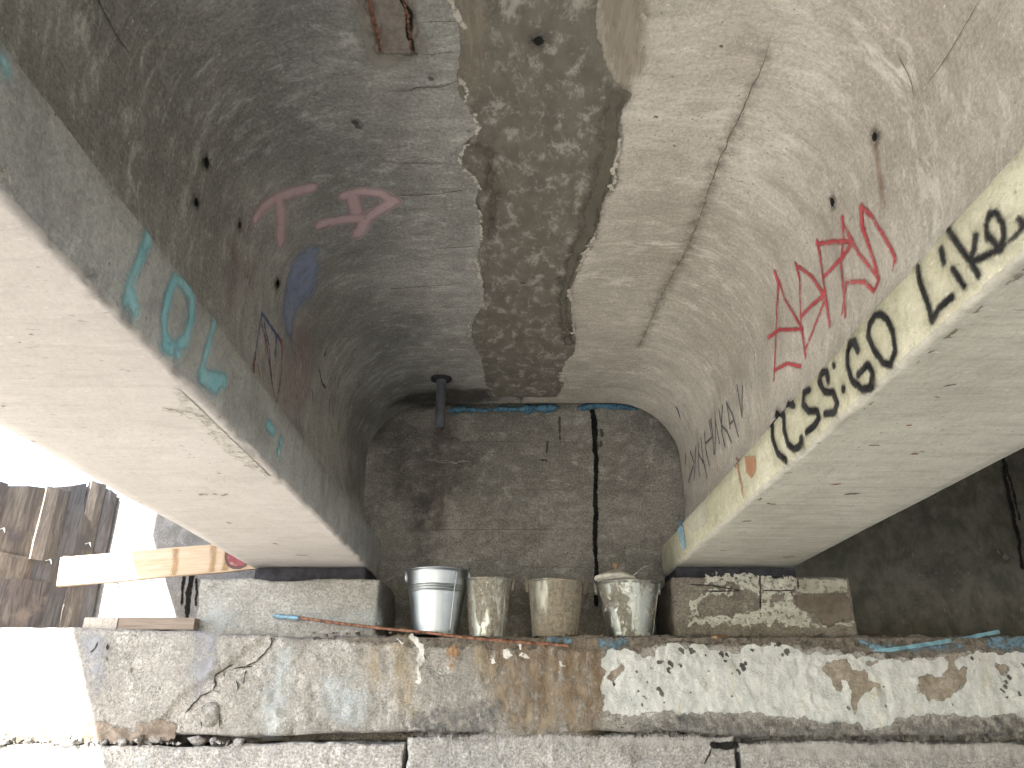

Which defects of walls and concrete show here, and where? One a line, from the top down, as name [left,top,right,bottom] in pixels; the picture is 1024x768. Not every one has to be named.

crack [637,34,772,350]
crack [589,409,599,607]
crack [1001,458,1024,570]
crack [185,633,273,713]
peeling [323,571,1024,735]